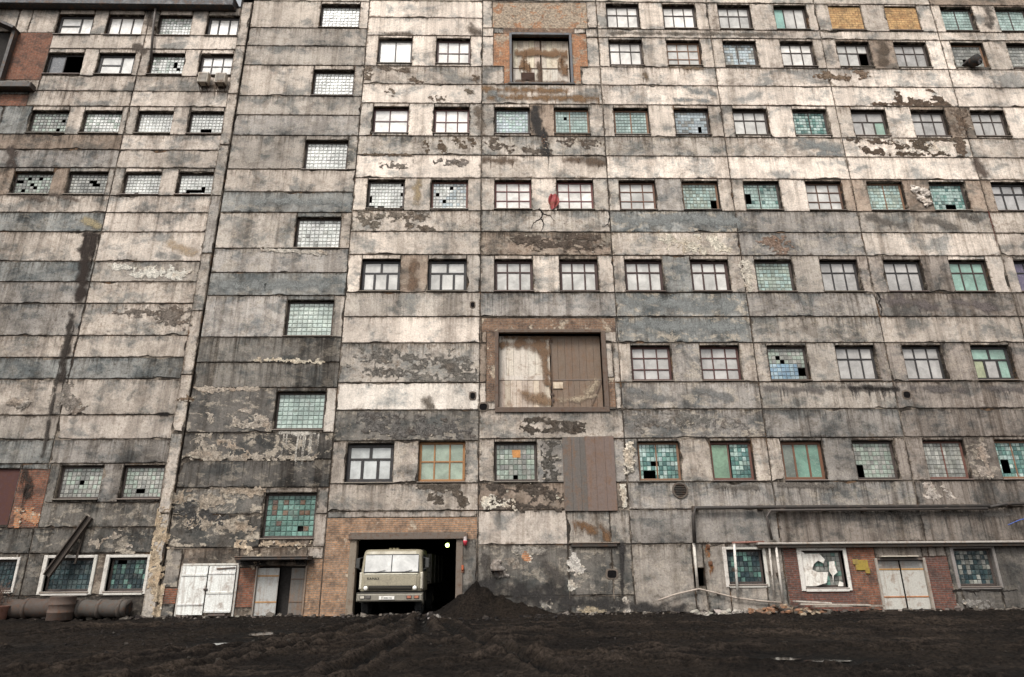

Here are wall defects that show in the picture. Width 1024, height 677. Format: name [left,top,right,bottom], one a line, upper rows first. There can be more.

flaking render [812,67,871,82]
flaking render [846,89,972,157]
flaking render [356,210,436,232]
crack [531,208,553,232]
damp [41,232,99,458]
flaking render [346,347,489,412]
flaking render [231,407,271,432]
flaking render [184,412,319,461]
flaking render [416,416,586,513]
flaking render [975,441,995,480]
spalling [13,507,40,528]
rust [574,521,610,542]